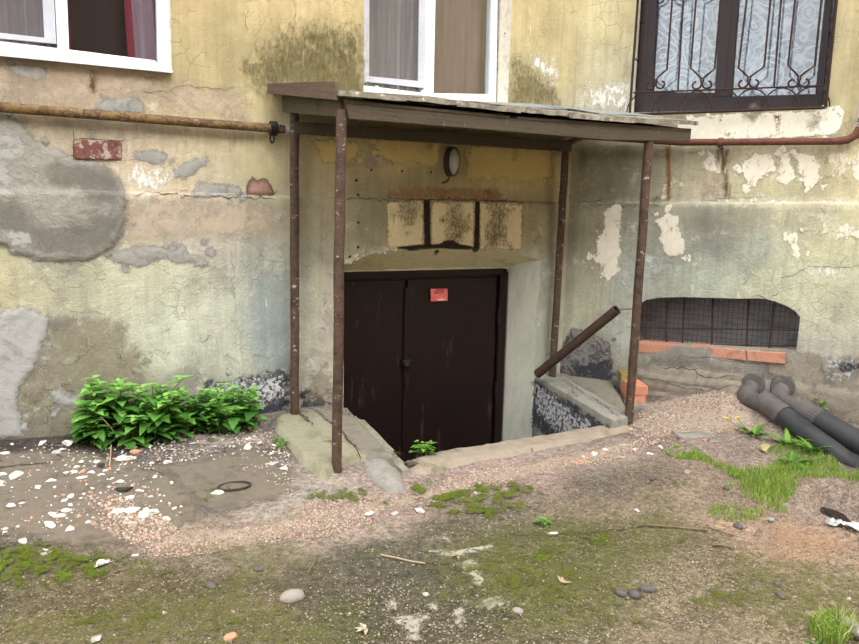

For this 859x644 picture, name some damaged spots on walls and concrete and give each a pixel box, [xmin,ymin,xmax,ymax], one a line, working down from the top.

damp [259,28,362,91]
flaking render [73,131,124,161]
peeling [697,150,721,174]
peeling [586,204,623,281]
peeling [654,178,693,262]
peeling [705,141,859,277]
crack [299,410,361,459]